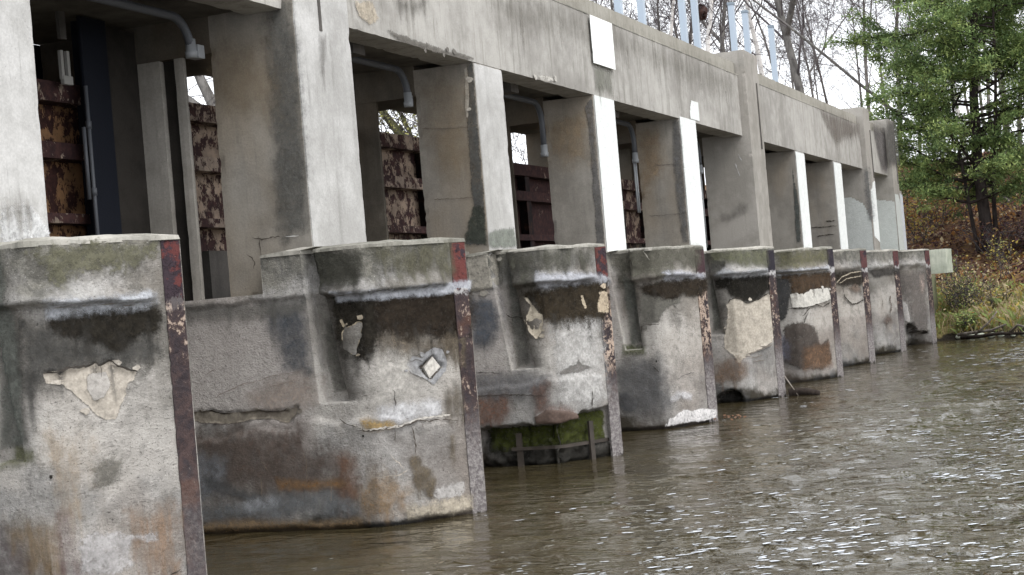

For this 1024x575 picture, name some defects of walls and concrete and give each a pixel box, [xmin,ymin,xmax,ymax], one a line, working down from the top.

peeling [524,297,545,339]
peeling [723,293,775,363]
water stain [640,260,928,369]
peeling [790,286,831,308]
water stain [18,292,162,412]
peeling [43,360,141,420]
crack [201,408,287,425]
spalling [351,414,451,431]
water stain [486,431,608,467]